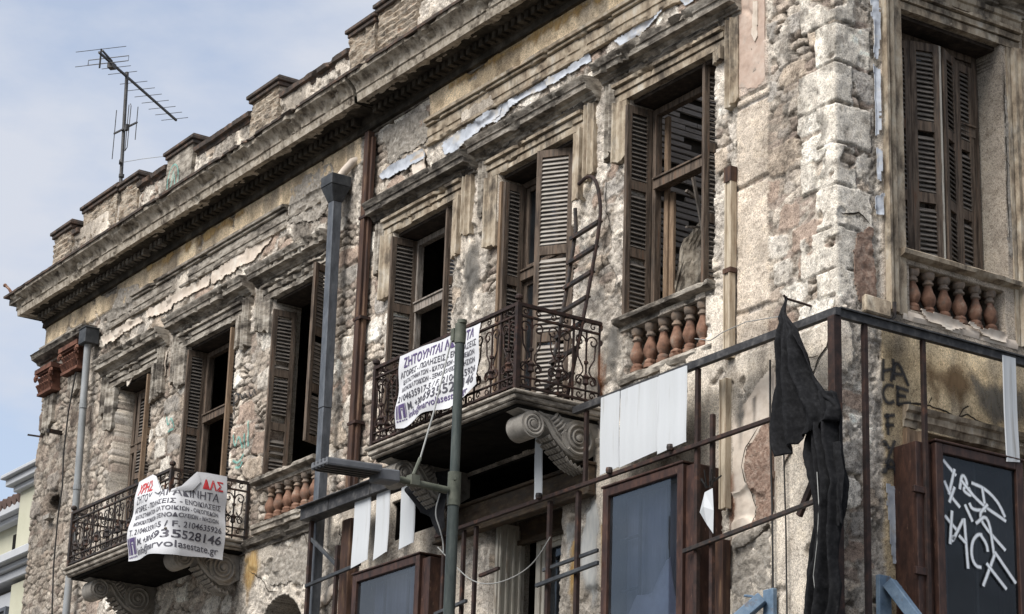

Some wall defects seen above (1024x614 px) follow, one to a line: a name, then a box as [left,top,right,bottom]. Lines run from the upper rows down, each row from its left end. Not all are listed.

peeling [614,10,662,46]
peeling [442,53,592,155]
flaking render [379,110,430,180]
peeling [101,237,272,346]
peeling [921,308,1008,343]
water stain [927,367,1004,423]
flaking render [731,368,788,614]